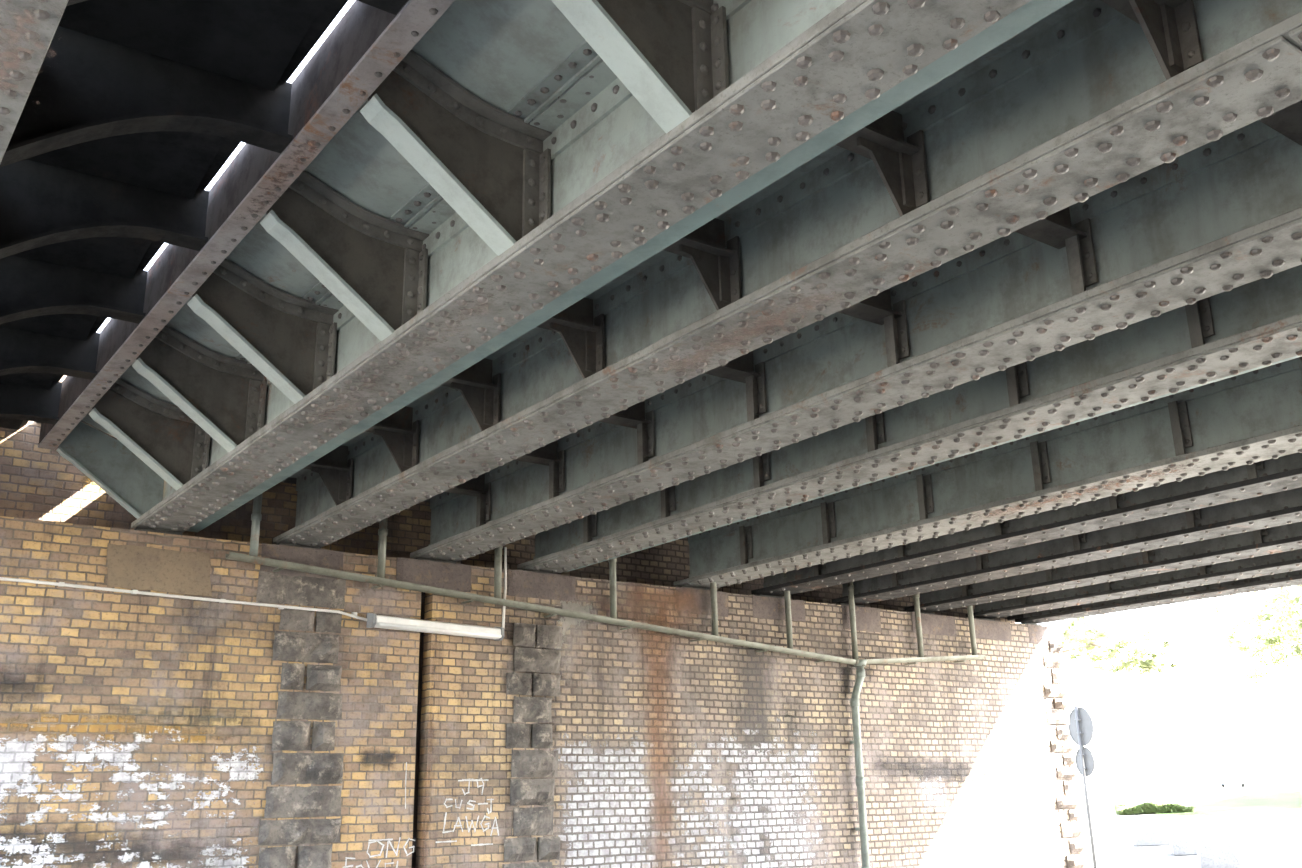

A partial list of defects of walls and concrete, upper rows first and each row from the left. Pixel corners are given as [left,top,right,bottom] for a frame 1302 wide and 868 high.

leakage [740,648,770,858]